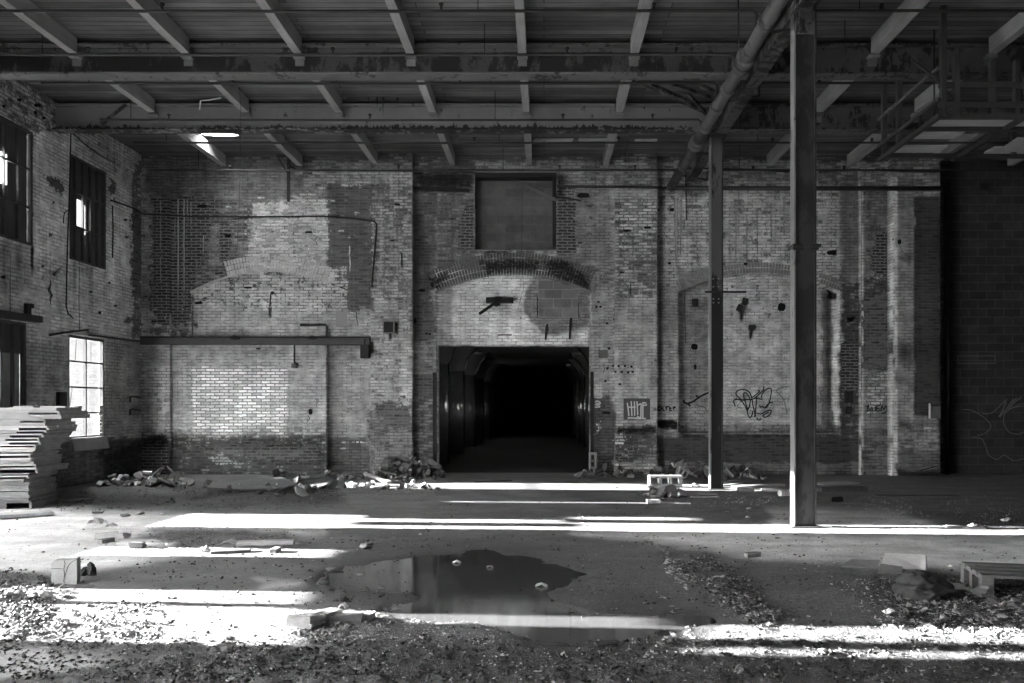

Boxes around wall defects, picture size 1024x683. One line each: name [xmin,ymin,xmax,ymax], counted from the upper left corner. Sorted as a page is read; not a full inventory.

peeling [123,179,369,336]